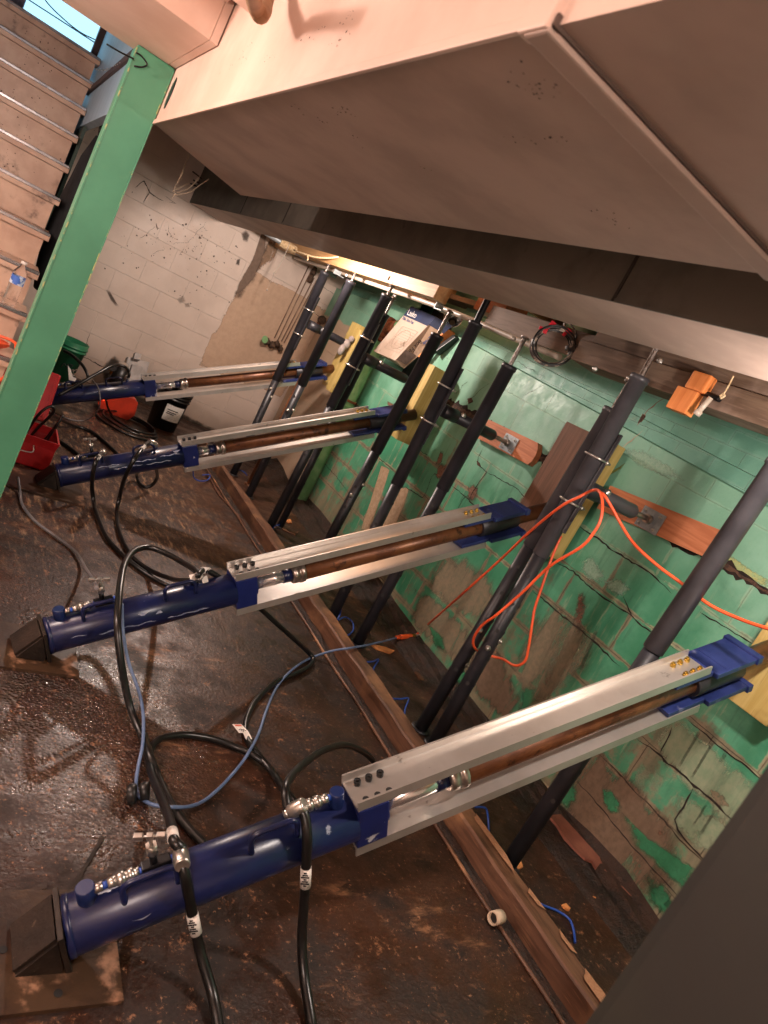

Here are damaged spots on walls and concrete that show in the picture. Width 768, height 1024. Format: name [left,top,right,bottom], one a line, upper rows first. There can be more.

crack [446,382,498,424]
peeling [412,558,492,661]
peeling [476,609,590,716]
crack [532,590,619,666]
crack [552,560,678,651]
crack [580,527,671,593]
crack [667,540,768,595]
crack [700,612,753,644]
crack [576,780,677,895]
peeling [549,725,752,913]
crack [601,721,759,860]